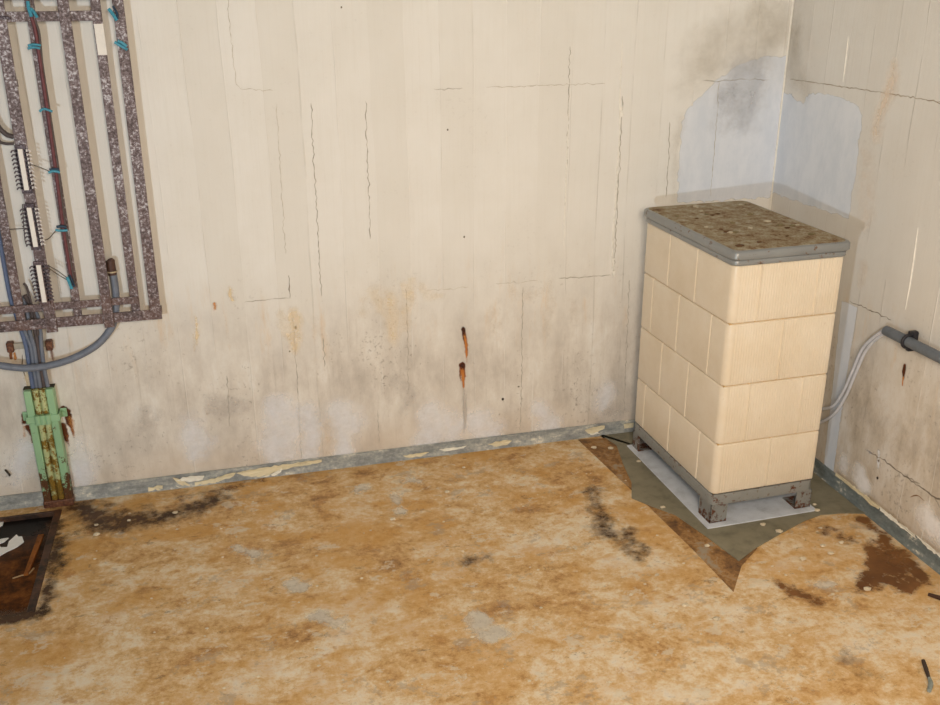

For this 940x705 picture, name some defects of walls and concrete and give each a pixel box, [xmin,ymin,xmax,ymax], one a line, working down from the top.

rust [459,327,468,388]
peeling [172,460,322,488]
crack [870,452,940,505]
peeling [835,473,940,557]